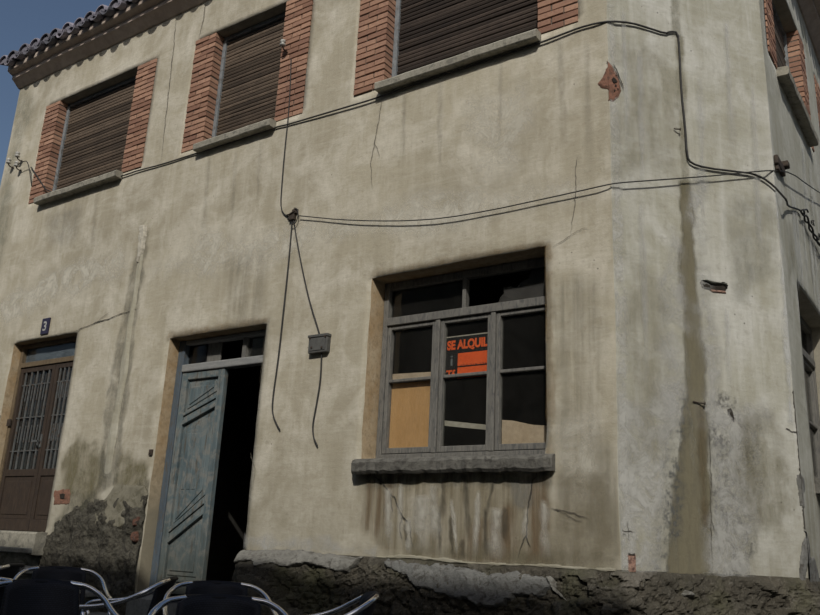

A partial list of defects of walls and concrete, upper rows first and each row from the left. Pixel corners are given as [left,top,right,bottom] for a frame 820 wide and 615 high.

spalling [598,61,624,102]
leakage [618,180,768,576]
crack [786,390,810,475]
flaking render [39,489,148,615]
leakage [406,473,467,555]
leakage [475,475,509,558]
crack [518,474,537,558]
crack [552,508,590,522]